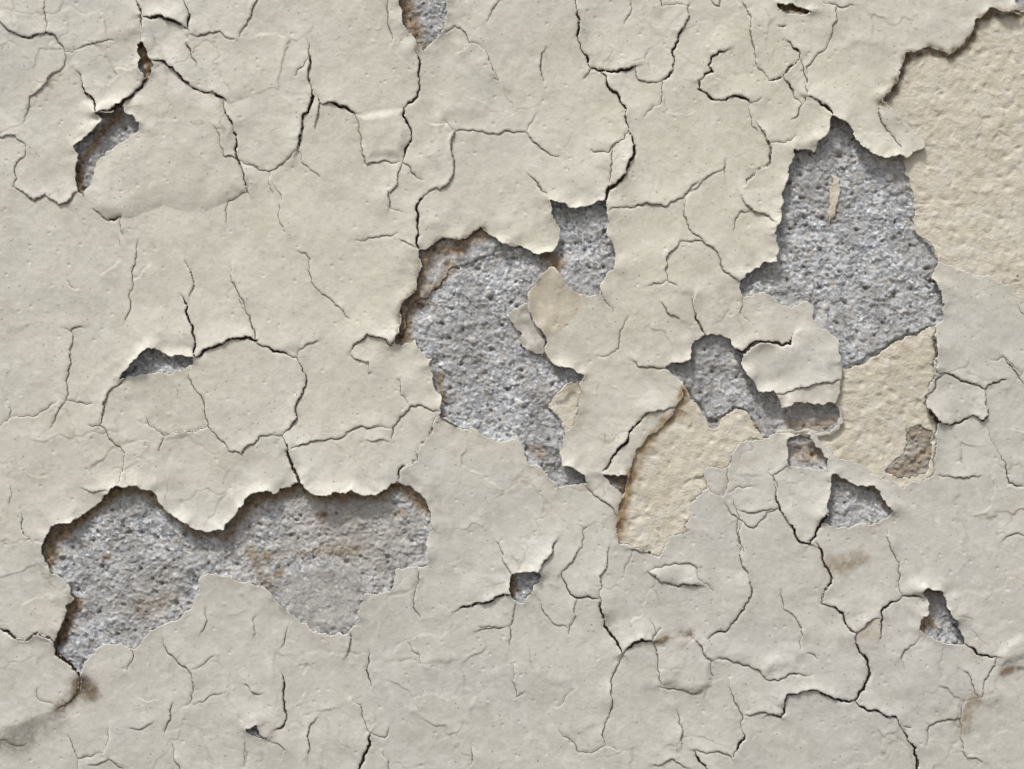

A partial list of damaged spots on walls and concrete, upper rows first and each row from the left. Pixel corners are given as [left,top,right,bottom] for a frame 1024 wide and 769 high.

spalling [399,0,447,51]
spalling [74,103,139,197]
crack [0,0,559,320]
crack [146,252,466,484]
spalling [21,149,616,678]
crack [586,408,670,517]
crack [575,0,852,355]
spalling [603,0,1024,557]
crack [925,333,1023,487]
crack [0,628,81,708]
crack [541,454,997,769]
spalling [856,588,964,645]